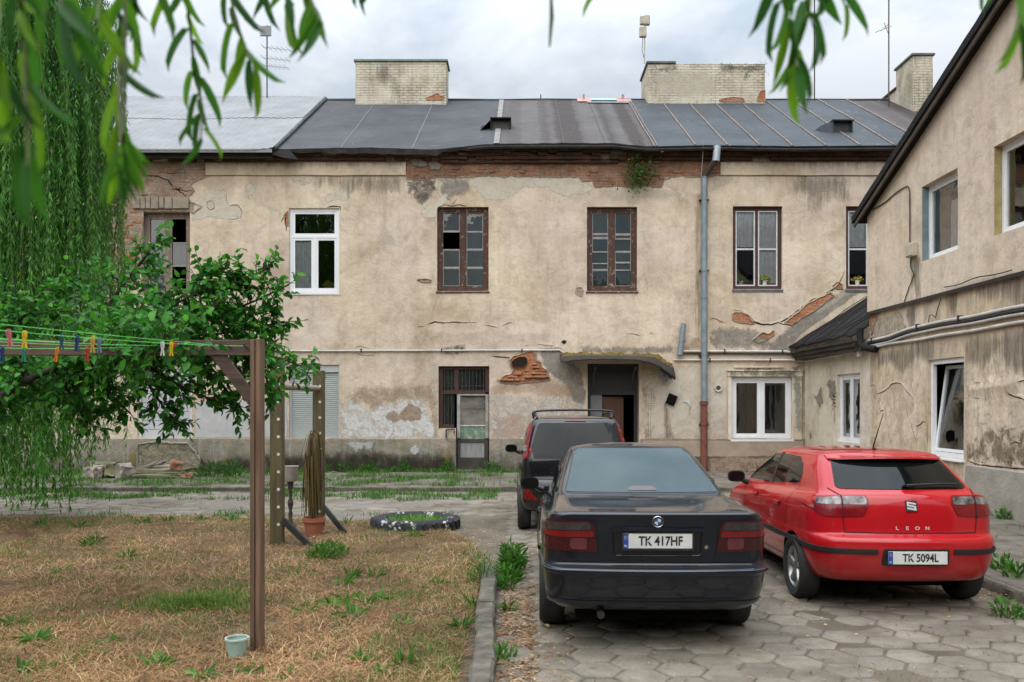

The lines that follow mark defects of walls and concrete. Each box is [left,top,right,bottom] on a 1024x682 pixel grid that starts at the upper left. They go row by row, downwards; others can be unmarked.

crack [142,175,192,196]
flaking render [405,157,721,218]
flaking render [94,161,215,288]
crack [418,319,554,358]
flaking render [732,281,846,343]
peeling [340,364,448,448]
crack [871,375,928,443]
crack [968,376,1024,423]